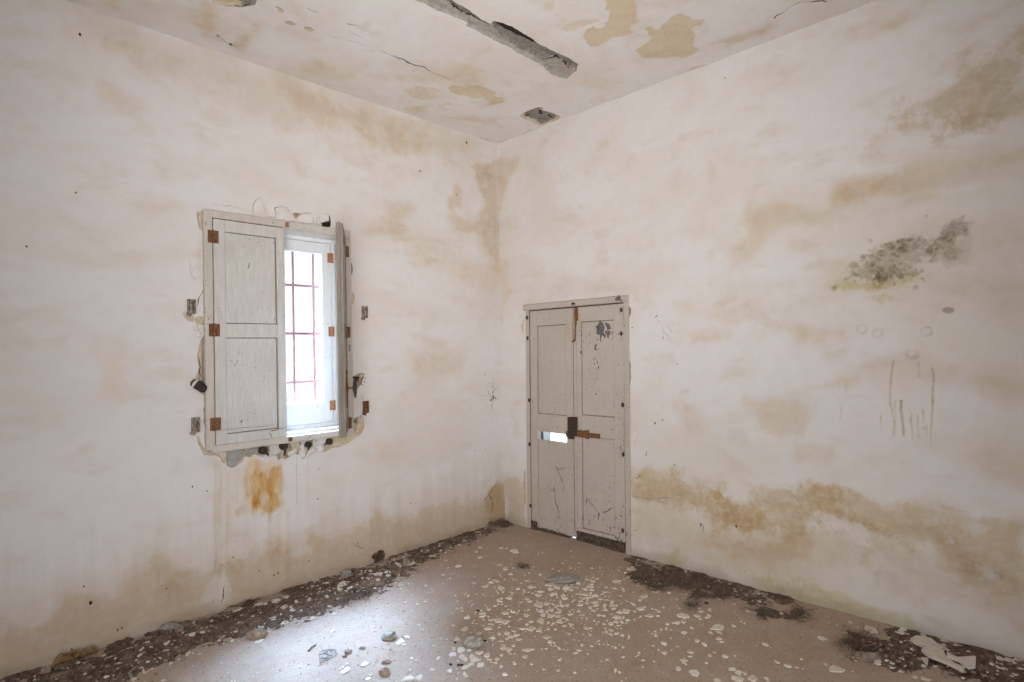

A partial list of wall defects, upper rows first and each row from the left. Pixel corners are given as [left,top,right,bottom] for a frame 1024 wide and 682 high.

crack [328,23,446,78]
flaking render [520,107,560,126]
flaking render [265,206,331,227]
flaking render [183,310,204,395]
flaking render [197,416,362,468]